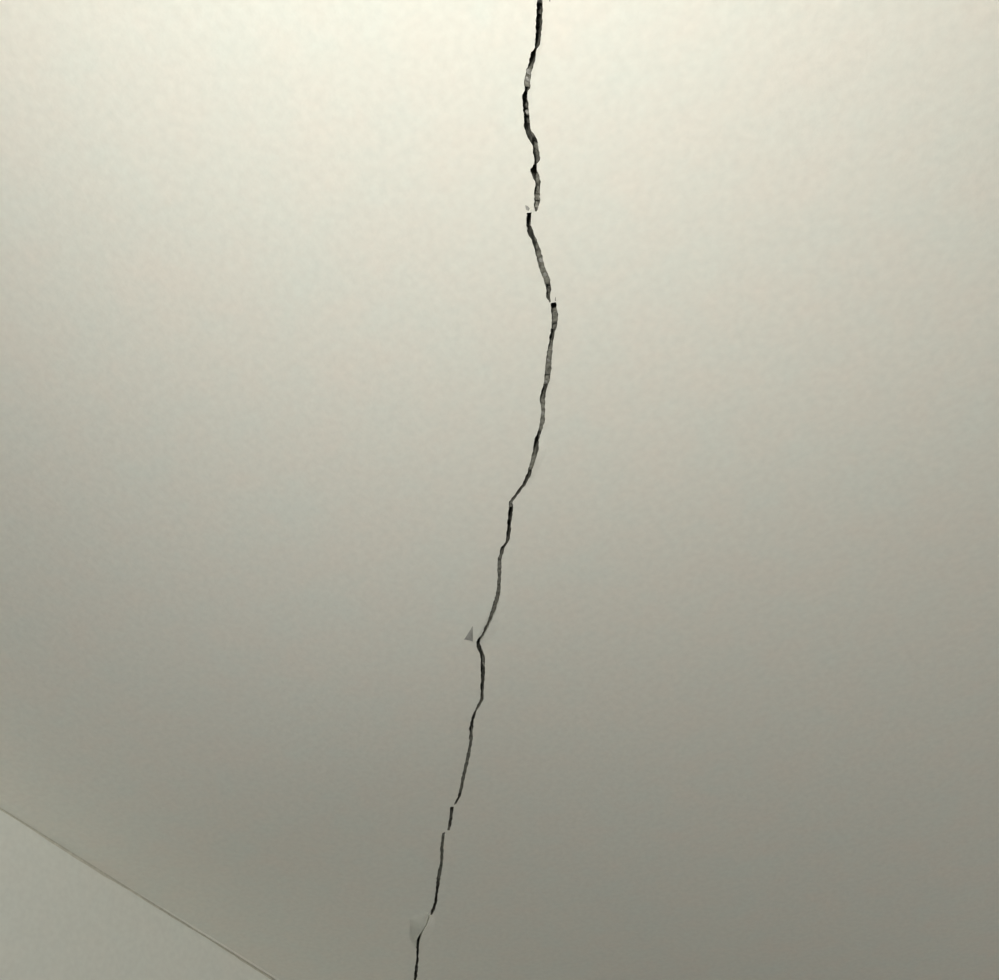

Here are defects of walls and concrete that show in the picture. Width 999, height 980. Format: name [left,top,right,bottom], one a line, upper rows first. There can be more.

crack [414,0,562,980]